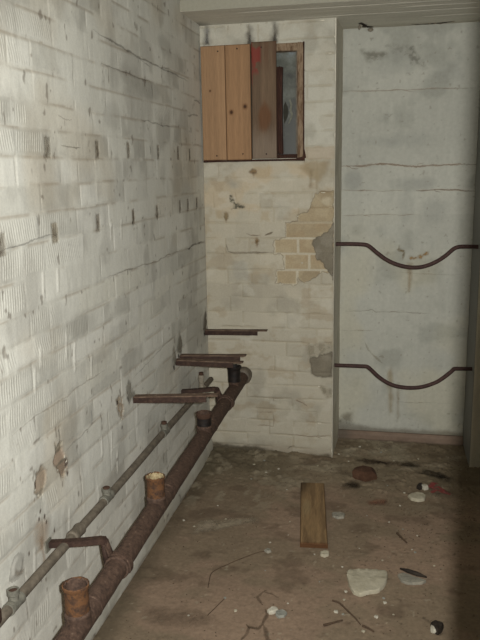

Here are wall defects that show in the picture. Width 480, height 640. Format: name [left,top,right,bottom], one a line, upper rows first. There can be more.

peeling [273,191,334,286]
spalling [53,442,68,477]
spalling [34,467,45,498]